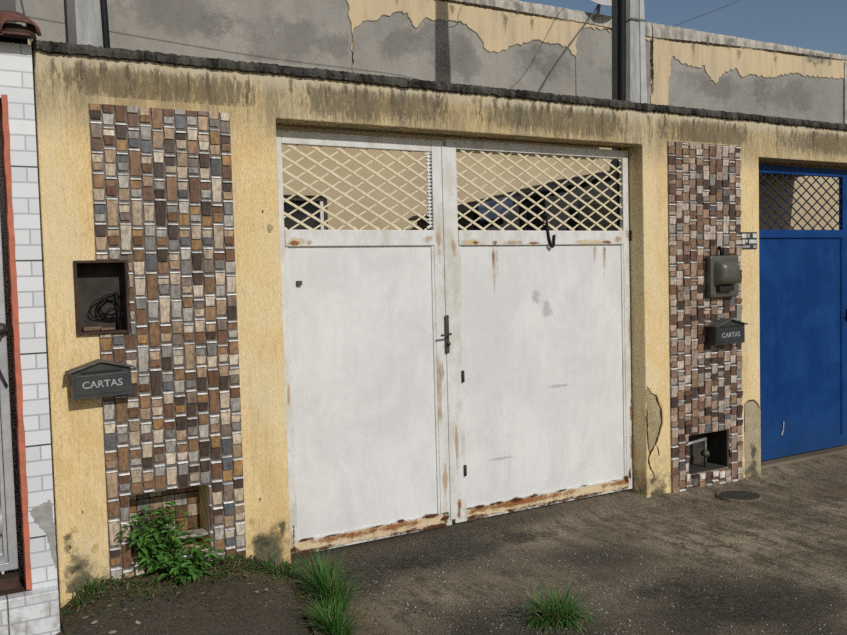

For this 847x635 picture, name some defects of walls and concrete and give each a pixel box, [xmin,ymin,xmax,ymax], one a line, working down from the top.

flaking render [15,0,66,43]
flaking render [107,0,612,100]
flaking render [645,38,653,104]
flaking render [668,56,843,124]
spalling [645,387,664,480]
spalling [744,399,761,477]
spalling [29,500,57,568]
leakage [65,534,94,593]
leakage [253,523,285,564]
rust [291,470,631,555]